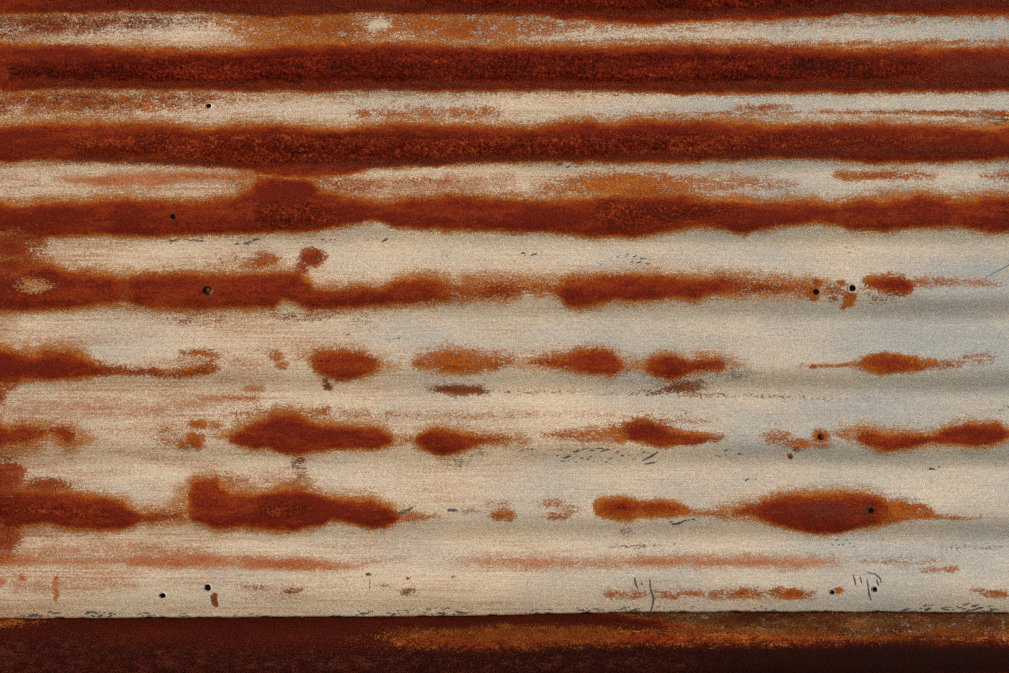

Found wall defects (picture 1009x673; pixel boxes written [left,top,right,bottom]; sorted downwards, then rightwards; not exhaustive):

rust [0,0,1009,334]
rust [266,340,841,401]
rust [800,351,995,377]
rust [541,411,727,449]
rust [760,417,1009,459]
rust [0,339,535,602]
rust [459,484,982,571]
rust [861,545,1002,573]
rust [0,586,1009,673]